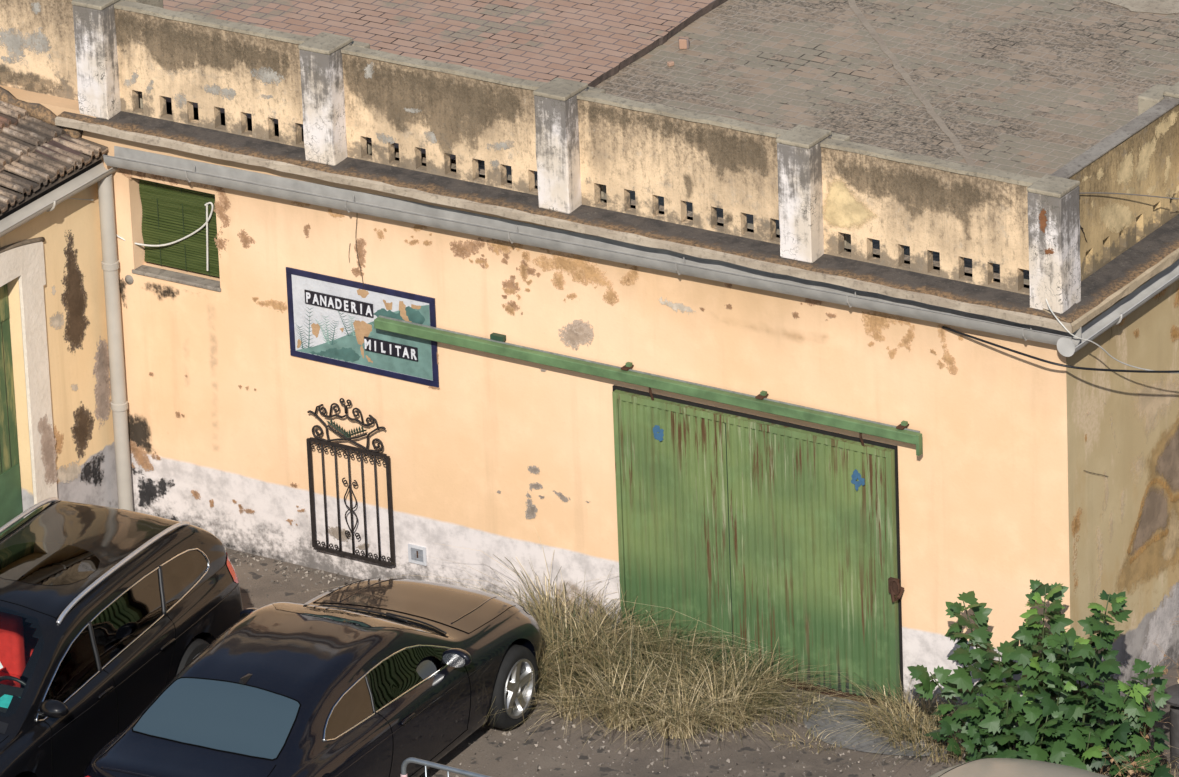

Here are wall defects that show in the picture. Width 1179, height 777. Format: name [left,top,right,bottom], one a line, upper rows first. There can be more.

peeling [405,224,432,246]
peeling [352,228,387,298]
peeling [449,237,639,316]
spalling [297,323,320,348]
spalling [340,320,373,363]
spalling [383,300,421,322]
spalling [558,319,594,351]
peeling [862,311,915,359]
peeling [930,324,963,375]
peeling [38,414,82,484]
spalling [525,465,571,519]
peeling [1162,509,1179,561]